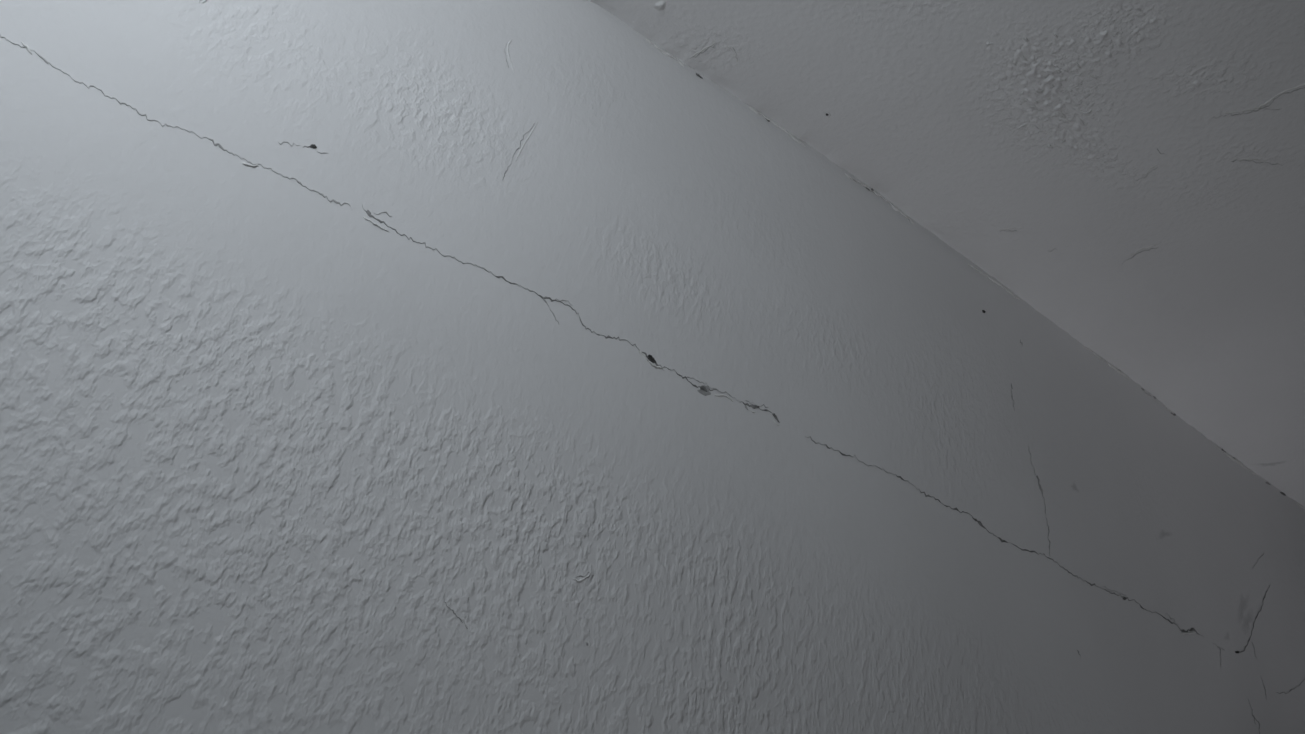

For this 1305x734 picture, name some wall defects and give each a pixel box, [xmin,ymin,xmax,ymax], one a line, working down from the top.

crack [0,35,779,426]
crack [810,436,1270,656]